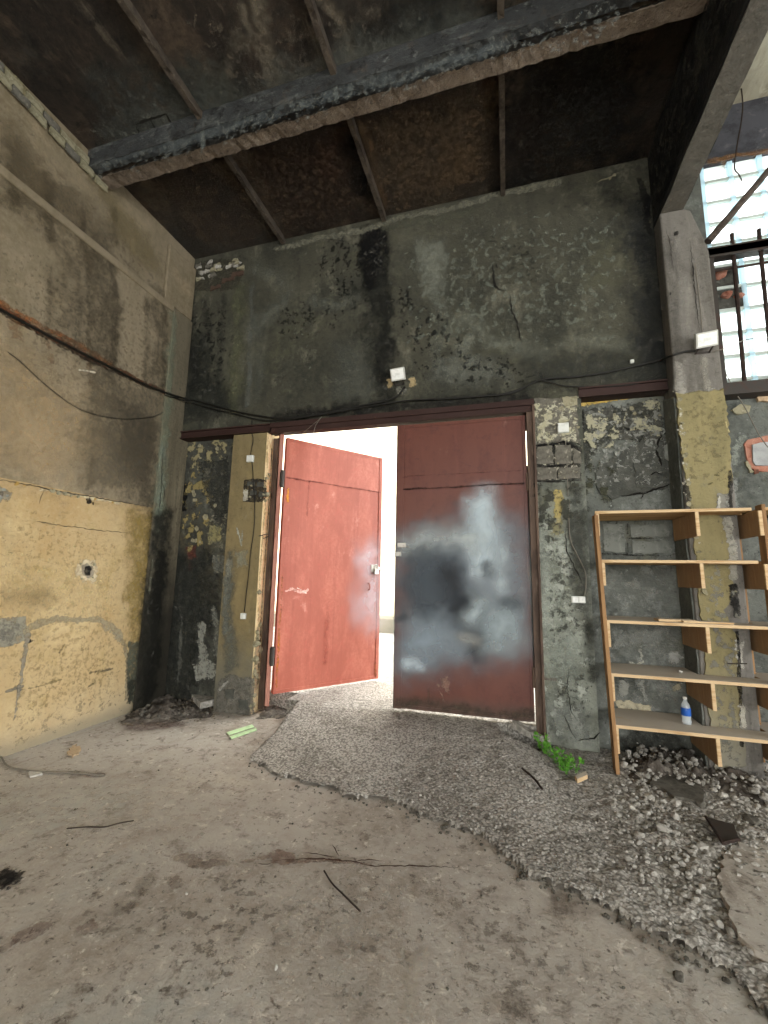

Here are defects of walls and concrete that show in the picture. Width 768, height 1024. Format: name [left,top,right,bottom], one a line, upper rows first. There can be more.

leakage [261,0,736,420]
flaking render [194,258,245,292]
crack [492,264,522,345]
leakage [2,138,237,706]
peeling [182,440,233,552]
peeling [532,396,692,526]
crack [627,435,669,498]
crack [564,665,599,741]